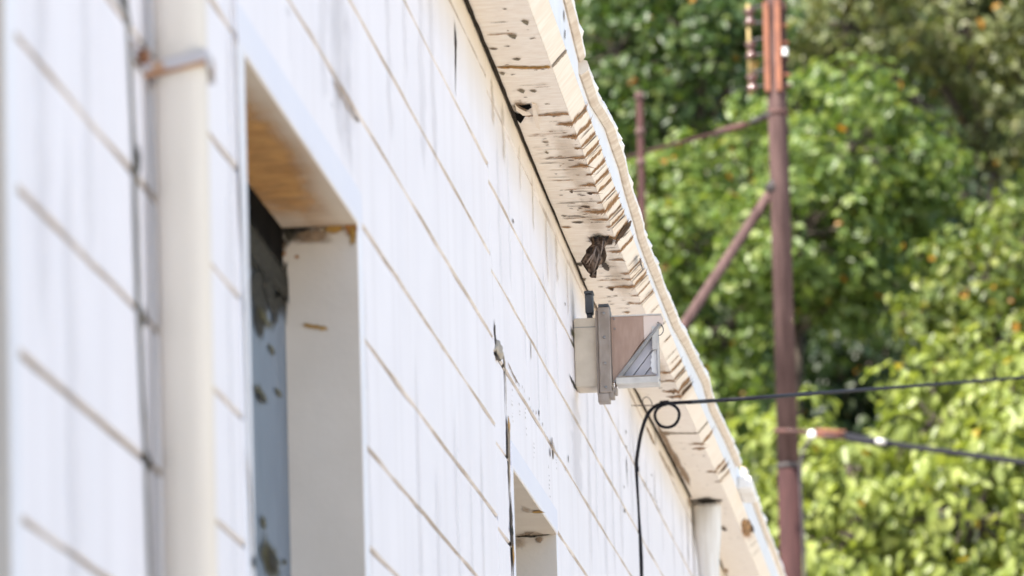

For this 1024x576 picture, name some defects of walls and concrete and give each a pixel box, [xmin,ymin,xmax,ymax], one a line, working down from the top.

peeling [515,90,656,313]
mould [255,386,282,403]
peeling [660,357,694,401]
peeling [697,459,730,489]
mould [261,516,287,576]
spalling [741,518,754,537]